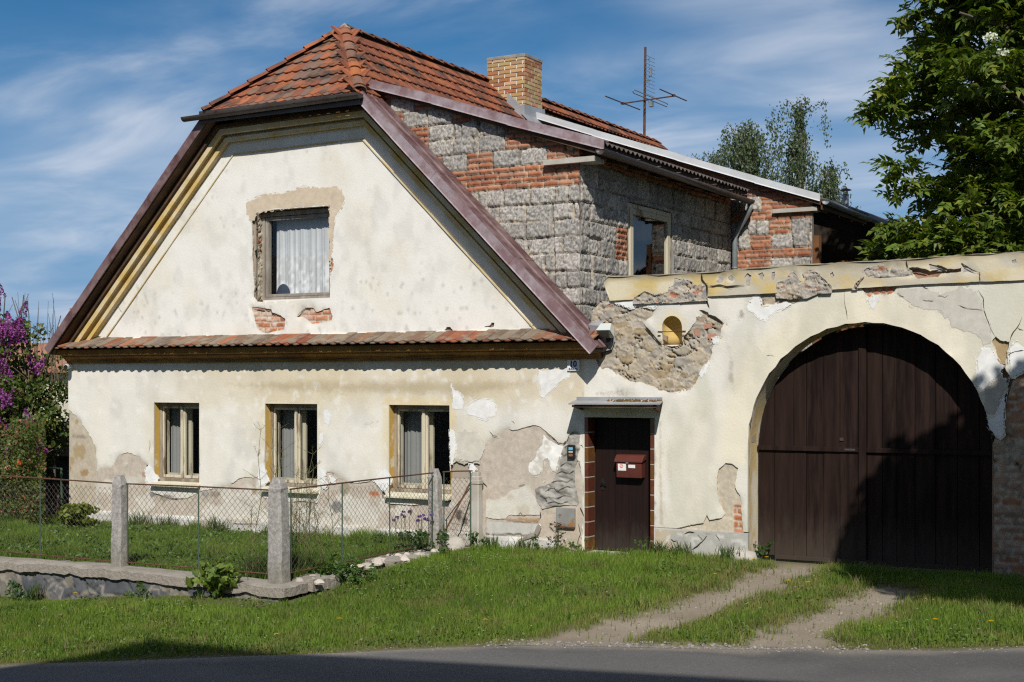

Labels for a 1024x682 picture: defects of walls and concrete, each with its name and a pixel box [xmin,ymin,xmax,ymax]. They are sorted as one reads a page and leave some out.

flaking render [252,307,285,334]
flaking render [298,308,332,324]
flaking render [591,270,834,393]
flaking render [852,264,975,309]
crack [900,260,1024,355]
peeling [451,383,497,421]
peeling [536,367,570,400]
flaking render [69,410,270,521]
flaking render [442,425,583,547]
flaking render [660,463,744,533]
flaking render [974,337,1024,579]